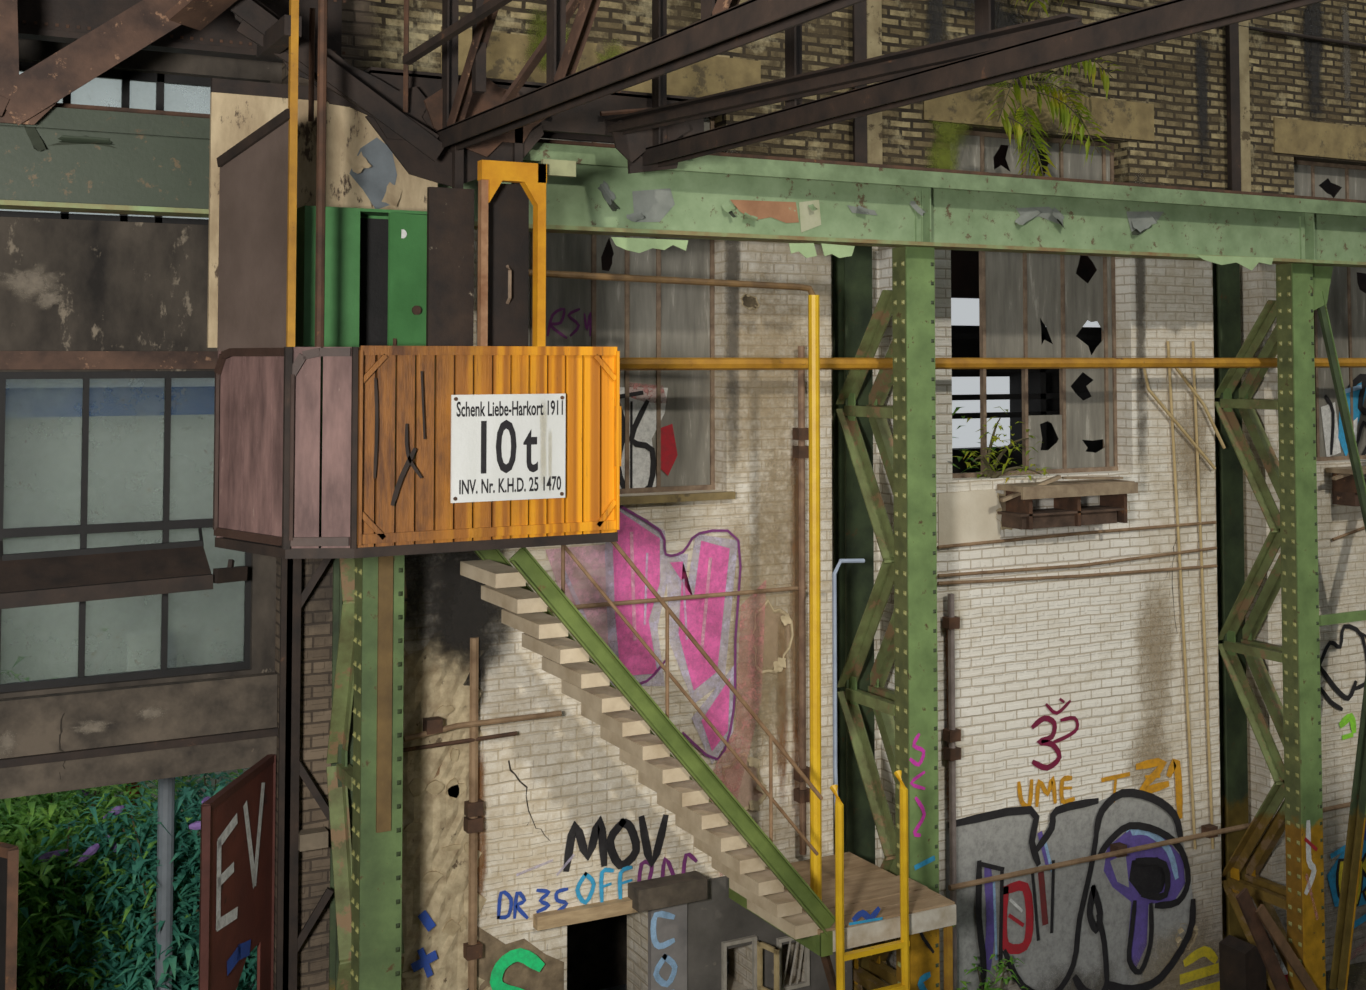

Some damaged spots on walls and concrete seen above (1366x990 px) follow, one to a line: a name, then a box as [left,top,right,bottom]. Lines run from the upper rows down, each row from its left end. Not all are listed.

peeling [346,138,402,209]
peeling [598,181,688,253]
peeling [721,200,855,258]
peeling [1015,207,1065,229]
peeling [1126,210,1164,235]
peeling [1197,255,1273,271]
peeling [5,267,61,307]
leakage [1179,407,1205,490]
leakage [463,666,485,702]